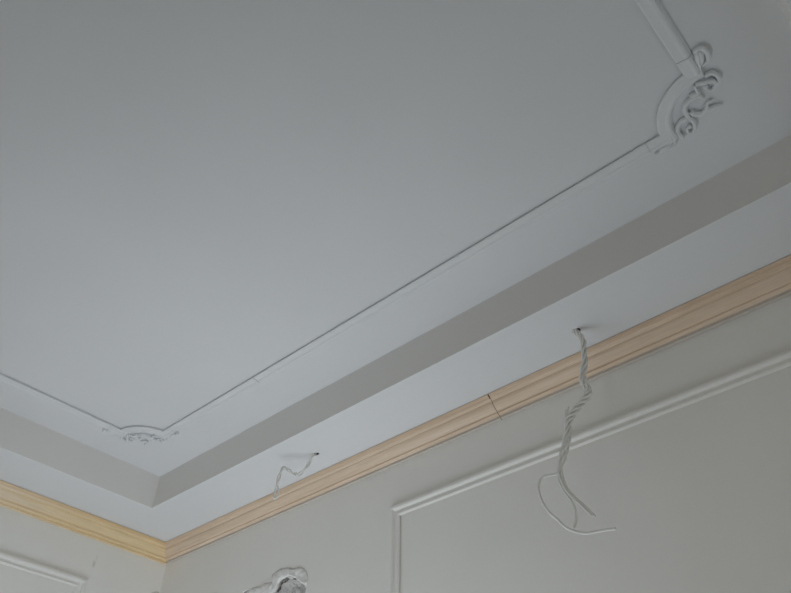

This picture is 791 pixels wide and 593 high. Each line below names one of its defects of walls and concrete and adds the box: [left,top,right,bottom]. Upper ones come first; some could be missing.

spalling [273,576,306,593]